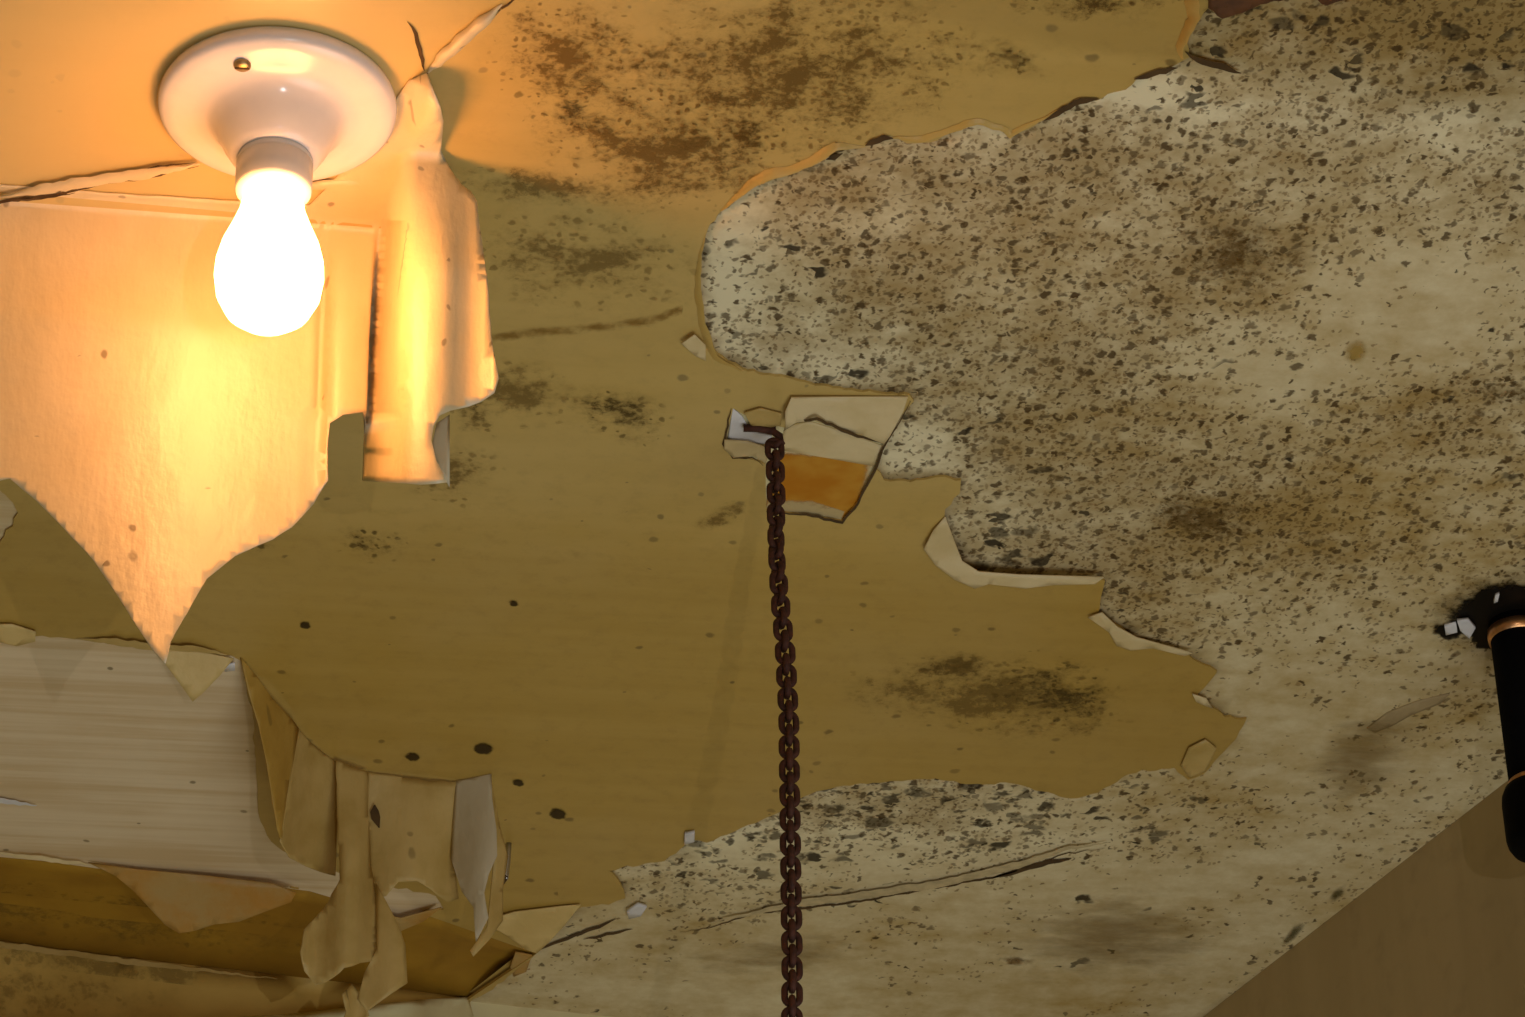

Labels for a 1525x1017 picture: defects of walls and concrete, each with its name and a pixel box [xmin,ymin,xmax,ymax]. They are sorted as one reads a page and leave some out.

crack [0,162,200,204]
mould [518,2,938,192]
peeling [0,73,794,1017]
peeling [681,0,1525,1017]
damp [998,672,1099,722]